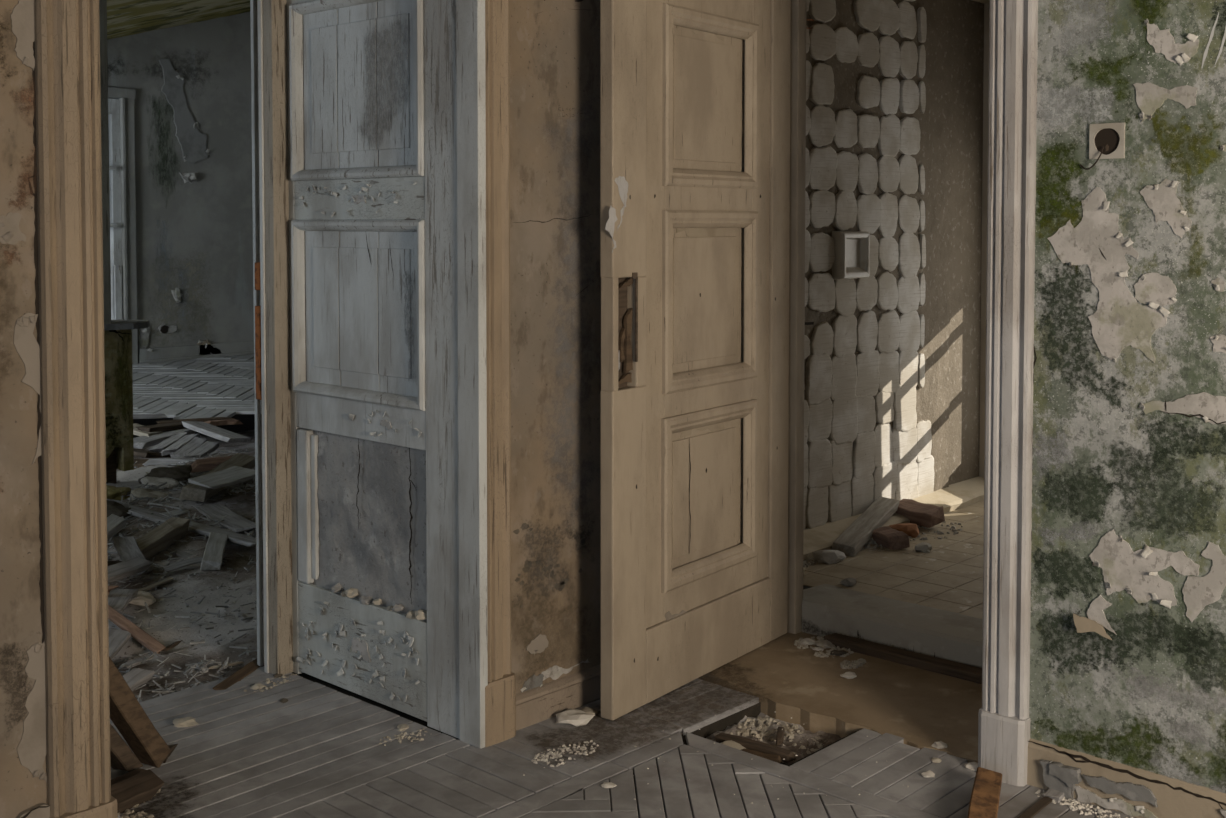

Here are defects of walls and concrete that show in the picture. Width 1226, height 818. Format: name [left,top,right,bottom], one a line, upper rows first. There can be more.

peeling [10,0,35,71]
peeling [1144,19,1199,66]
crack [28,42,40,346]
damp [1035,0,1226,280]
damp [1035,265,1131,412]
peeling [1047,187,1177,363]
crack [36,394,44,643]
damp [513,520,593,681]
damp [1033,414,1226,794]
peeling [1073,529,1226,640]
crack [22,805,50,818]
crack [1028,741,1226,809]